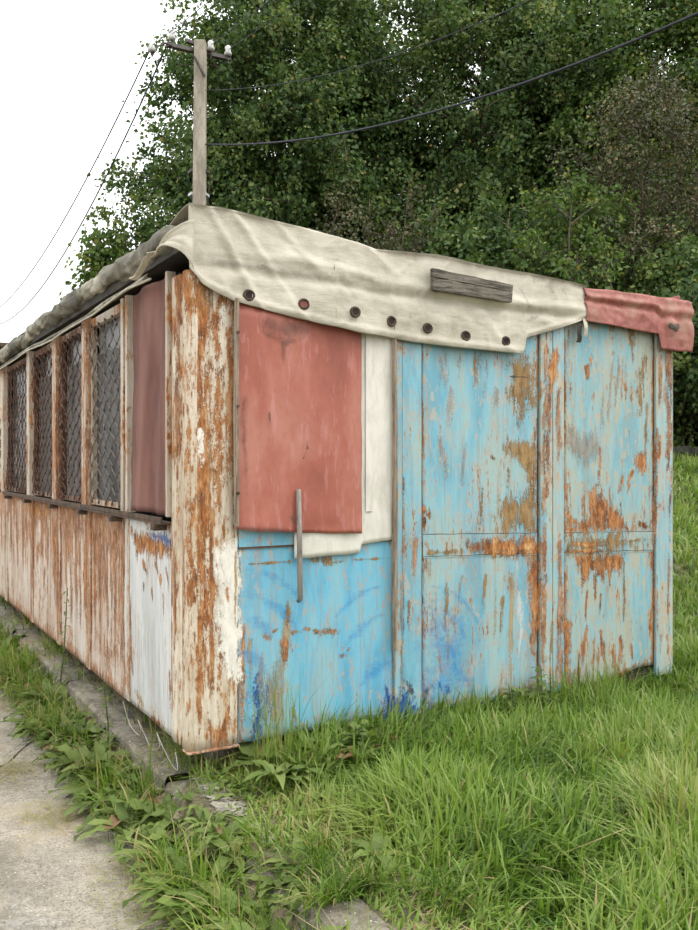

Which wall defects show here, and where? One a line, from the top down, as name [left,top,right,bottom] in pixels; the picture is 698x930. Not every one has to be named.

peeling [566,359,620,464]
peeling [628,329,649,456]
corrosion [5,283,245,748]
corrosion [310,556,343,566]
corrosion [400,345,673,697]
corrosion [273,602,293,719]